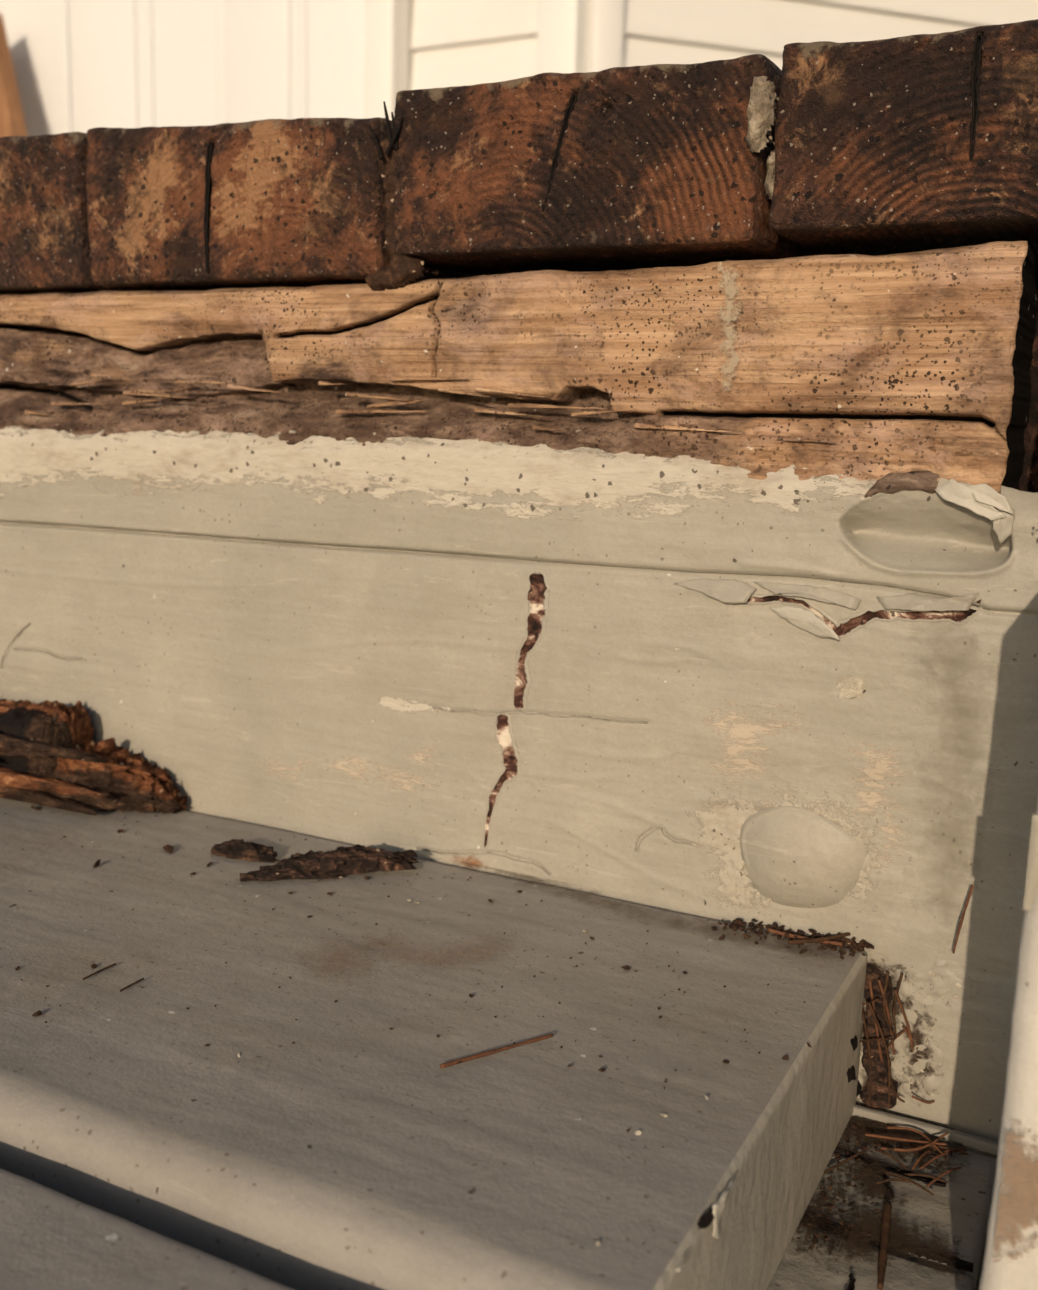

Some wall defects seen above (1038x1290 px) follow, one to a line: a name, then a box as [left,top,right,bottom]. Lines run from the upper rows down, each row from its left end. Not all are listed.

peeling [0,426,1015,544]
crack [0,519,990,876]
leakage [871,959,934,1089]